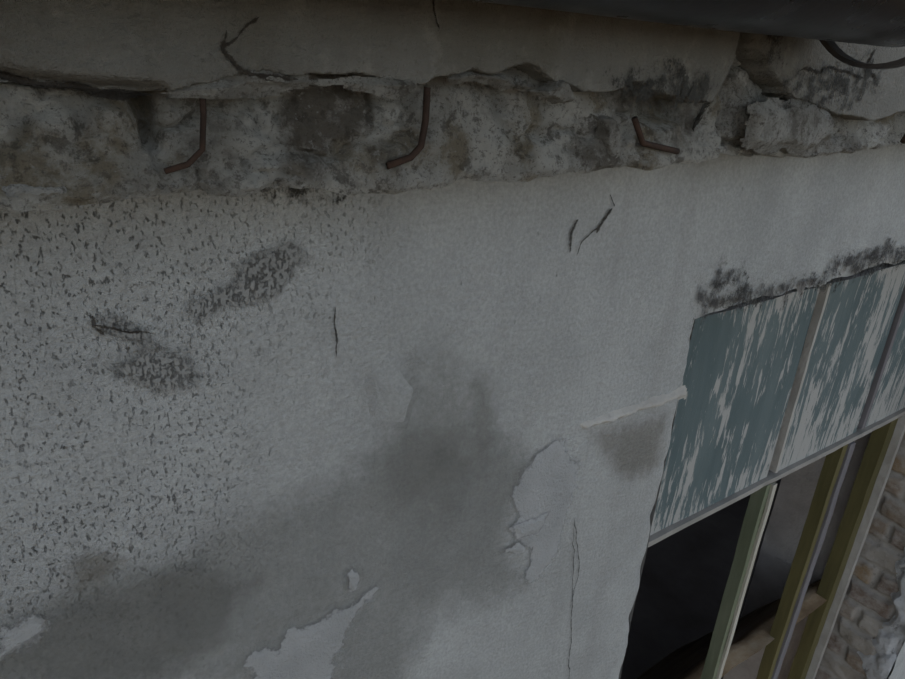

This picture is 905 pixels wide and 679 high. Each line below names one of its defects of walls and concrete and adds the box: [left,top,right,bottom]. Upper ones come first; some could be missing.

crack [0,70,152,101]
crack [220,17,298,81]
spalling [0,55,905,213]
crack [569,195,615,254]
flaking render [698,238,905,318]
peeling [243,569,379,679]
peeling [857,547,905,679]